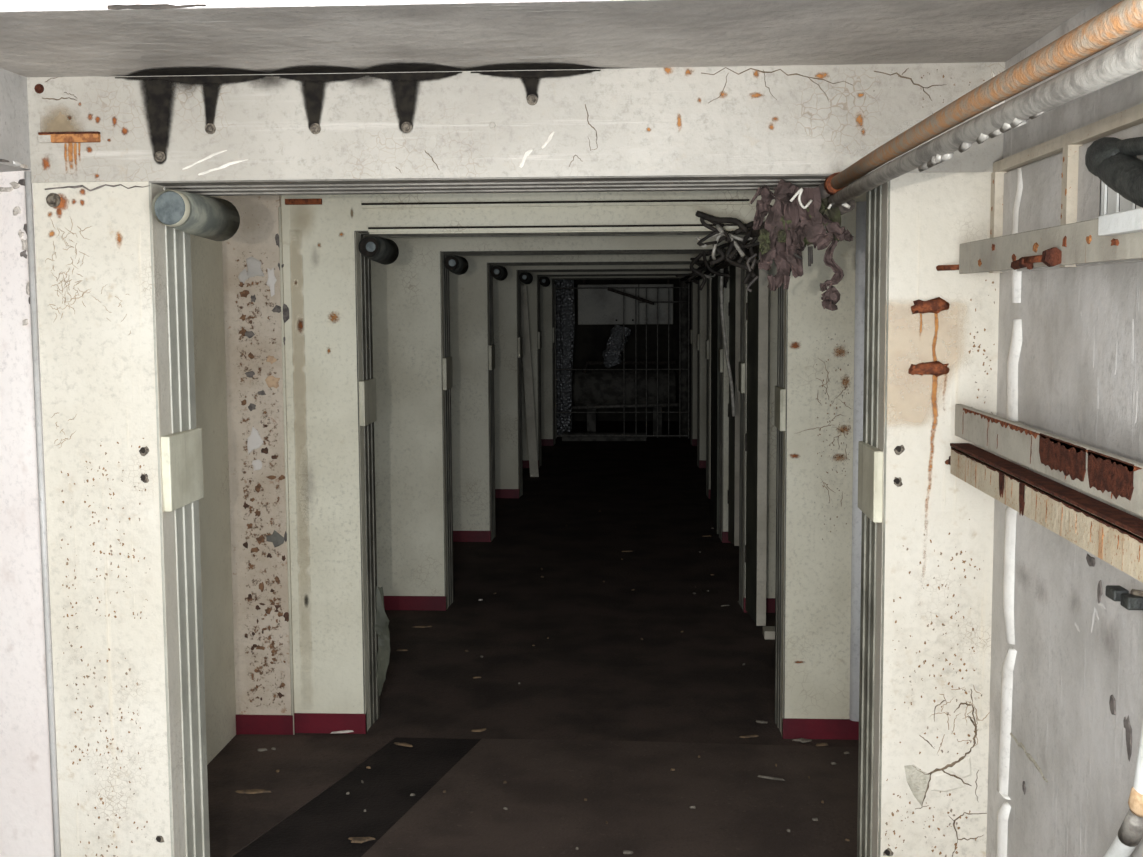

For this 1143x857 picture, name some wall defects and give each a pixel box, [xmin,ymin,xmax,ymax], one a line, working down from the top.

crack [702,67,947,103]
rust [64,143,92,169]
crack [45,183,150,191]
crack [45,218,131,333]
peeling [234,252,289,707]
rust [910,299,949,505]
rust [951,448,1143,560]
rust [963,408,1142,501]
spalling [904,757,972,806]
crack [913,685,990,857]